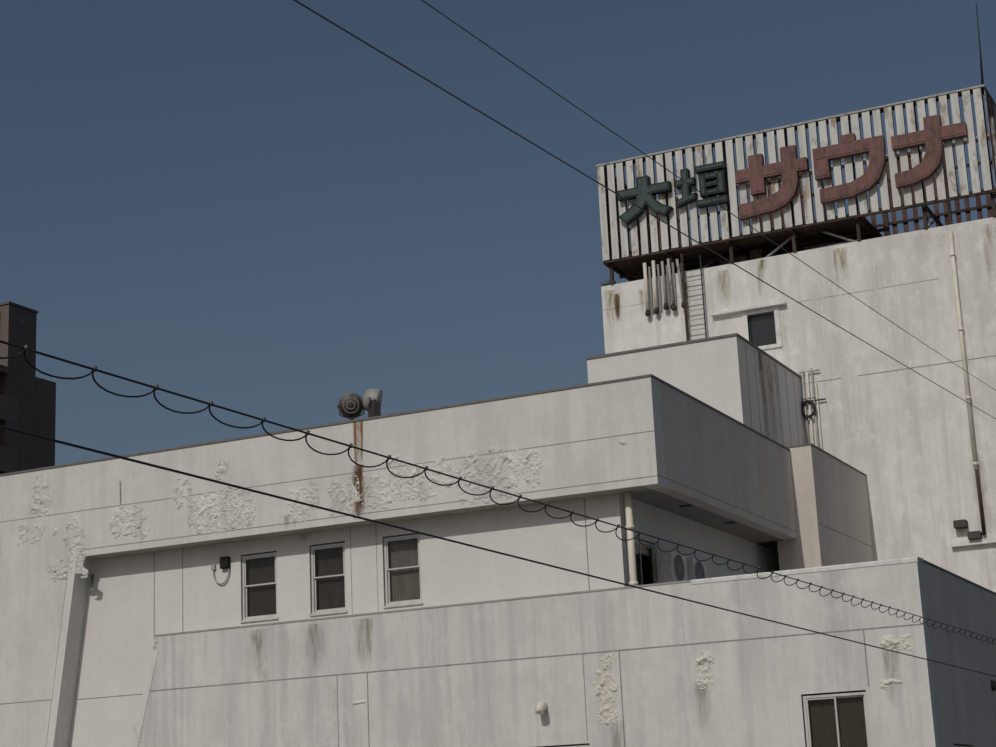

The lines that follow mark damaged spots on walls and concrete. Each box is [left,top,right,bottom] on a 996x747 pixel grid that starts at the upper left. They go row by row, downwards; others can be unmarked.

rust [354,421,364,514]